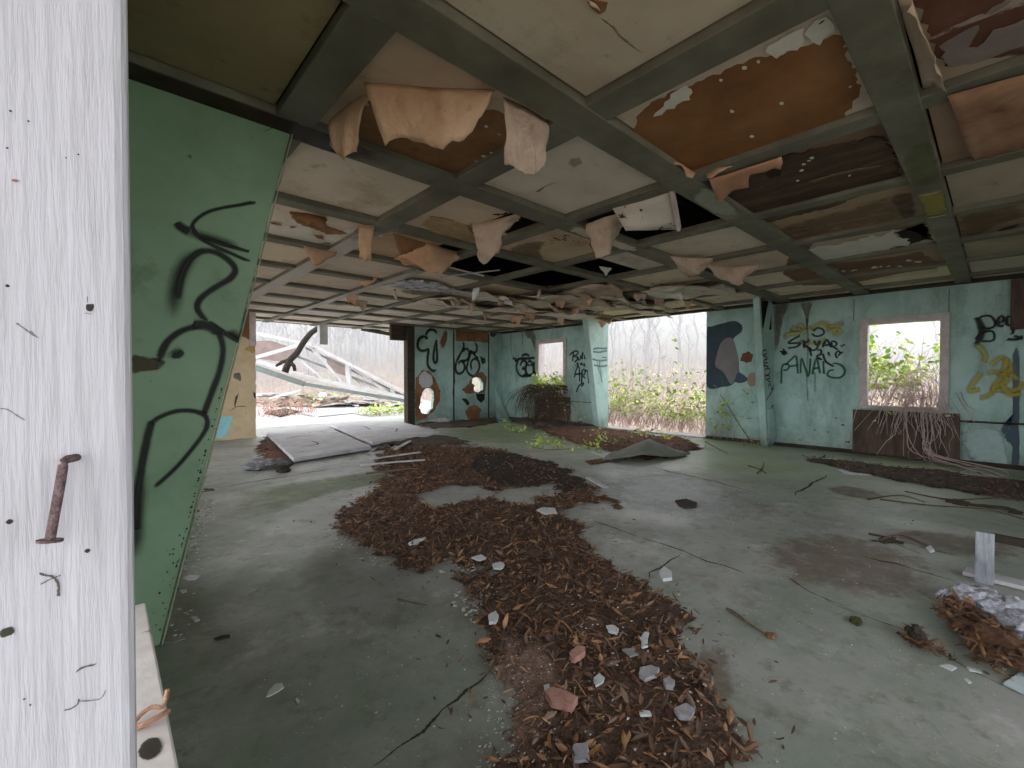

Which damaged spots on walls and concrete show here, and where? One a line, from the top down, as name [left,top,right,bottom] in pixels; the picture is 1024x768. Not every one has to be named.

peeling [898,0,1024,92]
peeling [358,101,506,174]
peeling [633,17,861,216]
peeling [294,270,426,313]
hole [415,370,440,421]
spalling [462,372,487,405]
crack [595,521,741,579]
crack [374,671,490,766]